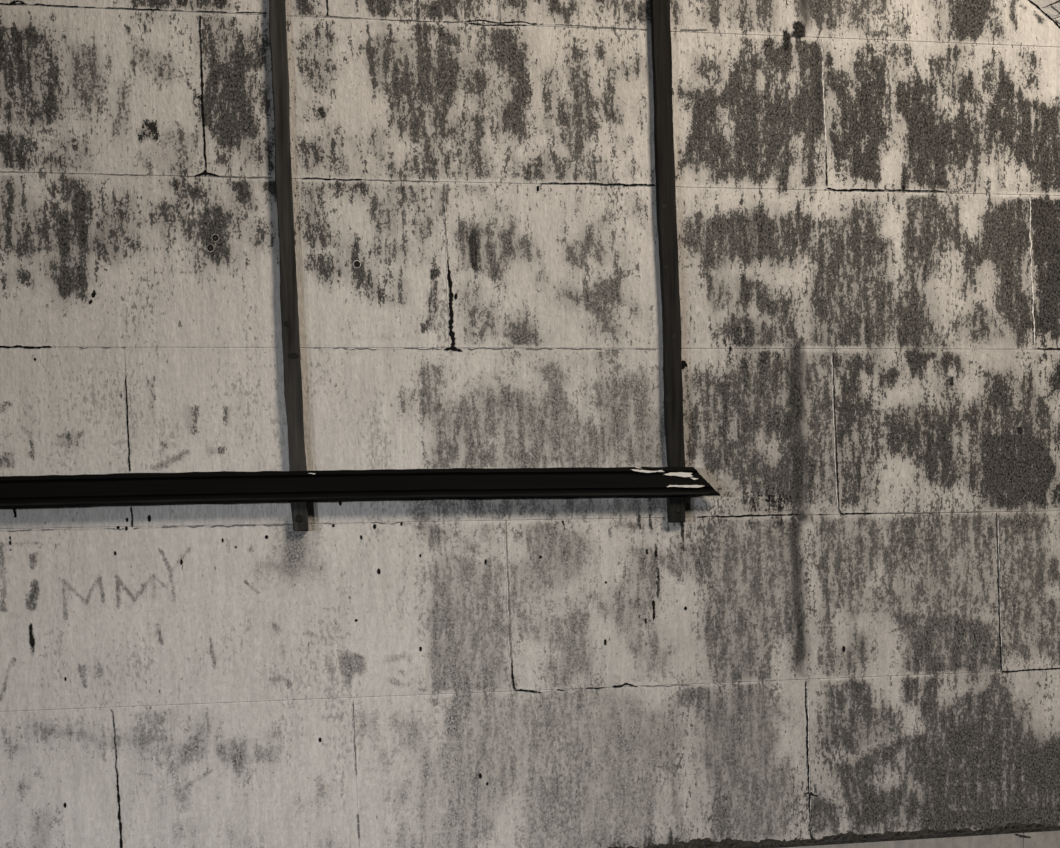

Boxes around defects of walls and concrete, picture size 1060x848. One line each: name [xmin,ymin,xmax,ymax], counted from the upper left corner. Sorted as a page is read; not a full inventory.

crack [0,0,272,179]
leakage [0,0,279,316]
crack [318,0,647,30]
crack [302,177,657,352]
leakage [150,442,188,471]
leakage [285,0,1060,848]